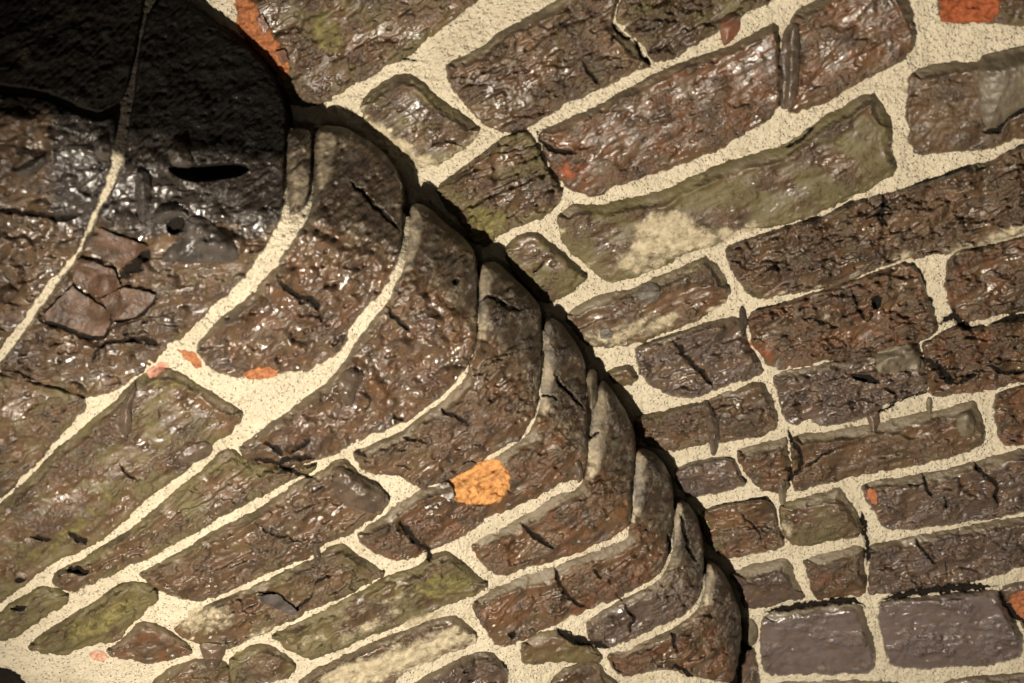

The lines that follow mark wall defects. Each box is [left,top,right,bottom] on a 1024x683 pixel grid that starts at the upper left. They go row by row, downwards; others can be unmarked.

crack [121,249,151,279]
crack [43,298,159,359]
crack [673,341,711,385]
crack [520,522,587,608]